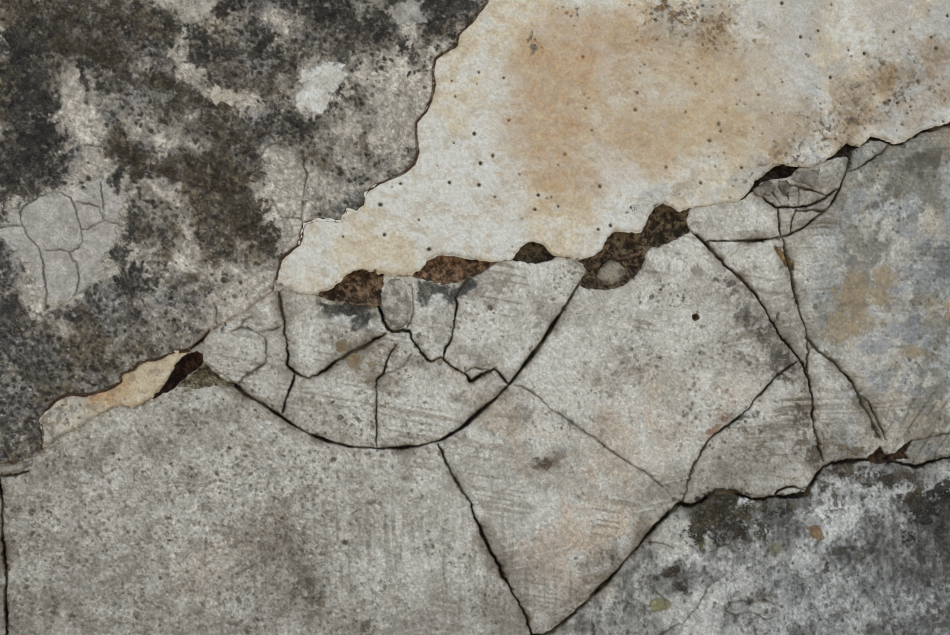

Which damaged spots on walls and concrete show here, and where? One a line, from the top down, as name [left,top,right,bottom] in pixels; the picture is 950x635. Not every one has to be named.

water stain [0,0,317,259]
water stain [325,82,358,113]
water stain [276,0,479,78]
flaking render [275,0,950,306]
crack [15,187,120,307]
water stain [109,204,164,297]
crack [0,471,28,635]
peeling [0,459,33,474]
flaking render [39,348,234,450]
crack [215,122,950,635]
water stain [679,488,794,552]
water stain [713,276,950,565]